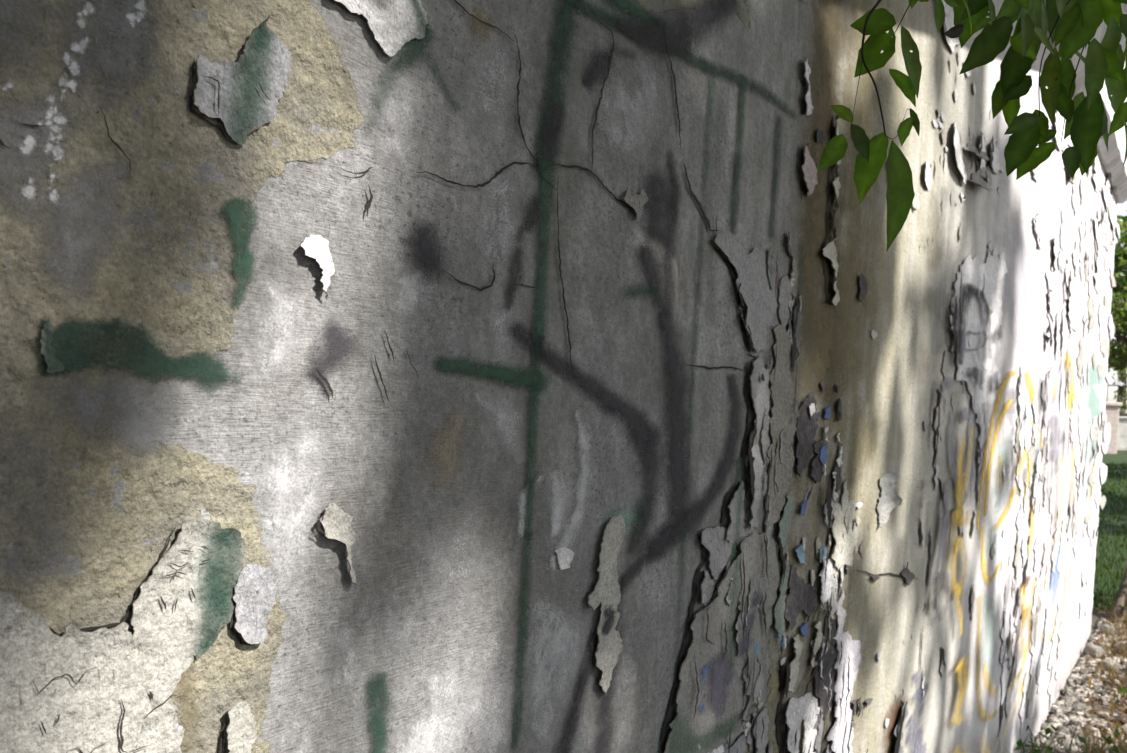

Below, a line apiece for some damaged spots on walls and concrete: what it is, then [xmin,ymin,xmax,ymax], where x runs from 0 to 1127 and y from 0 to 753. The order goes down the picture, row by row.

crack [343,167,373,217]
peeling [334,0,428,57]
crack [416,0,629,385]
crack [663,22,719,232]
peeling [1055,111,1072,151]
spalling [0,0,364,753]
peeling [661,231,902,753]
peeling [901,561,915,585]
peeling [923,240,1008,546]
peeling [991,150,1120,735]
peeling [883,689,909,753]